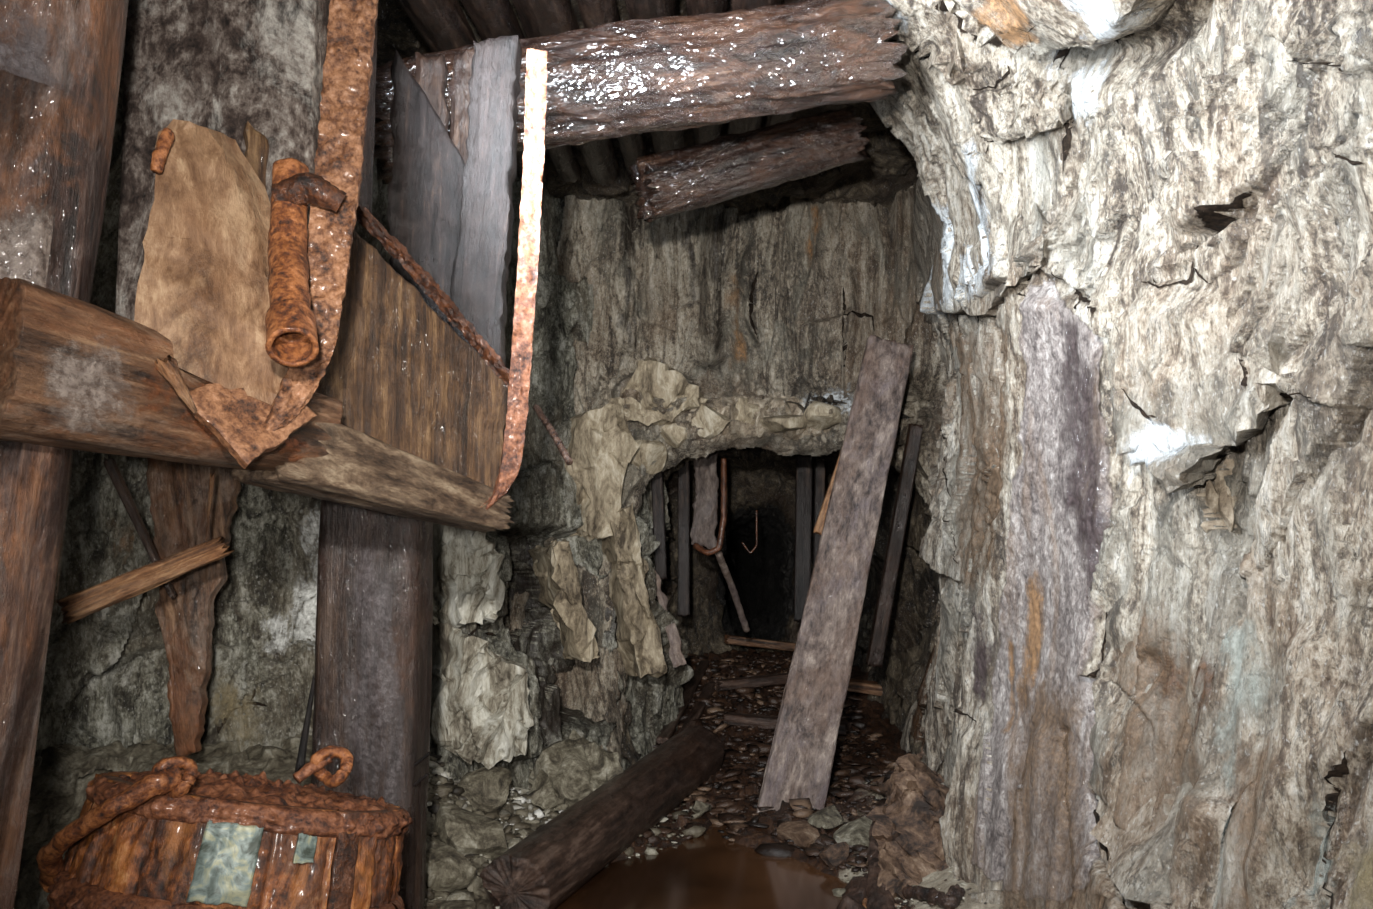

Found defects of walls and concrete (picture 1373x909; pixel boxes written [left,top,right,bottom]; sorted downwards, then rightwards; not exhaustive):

crack [1121,388,1155,426]
crack [1239,359,1310,421]
leakage [1060,316,1104,596]
crack [1087,612,1108,678]
crack [1091,790,1109,861]